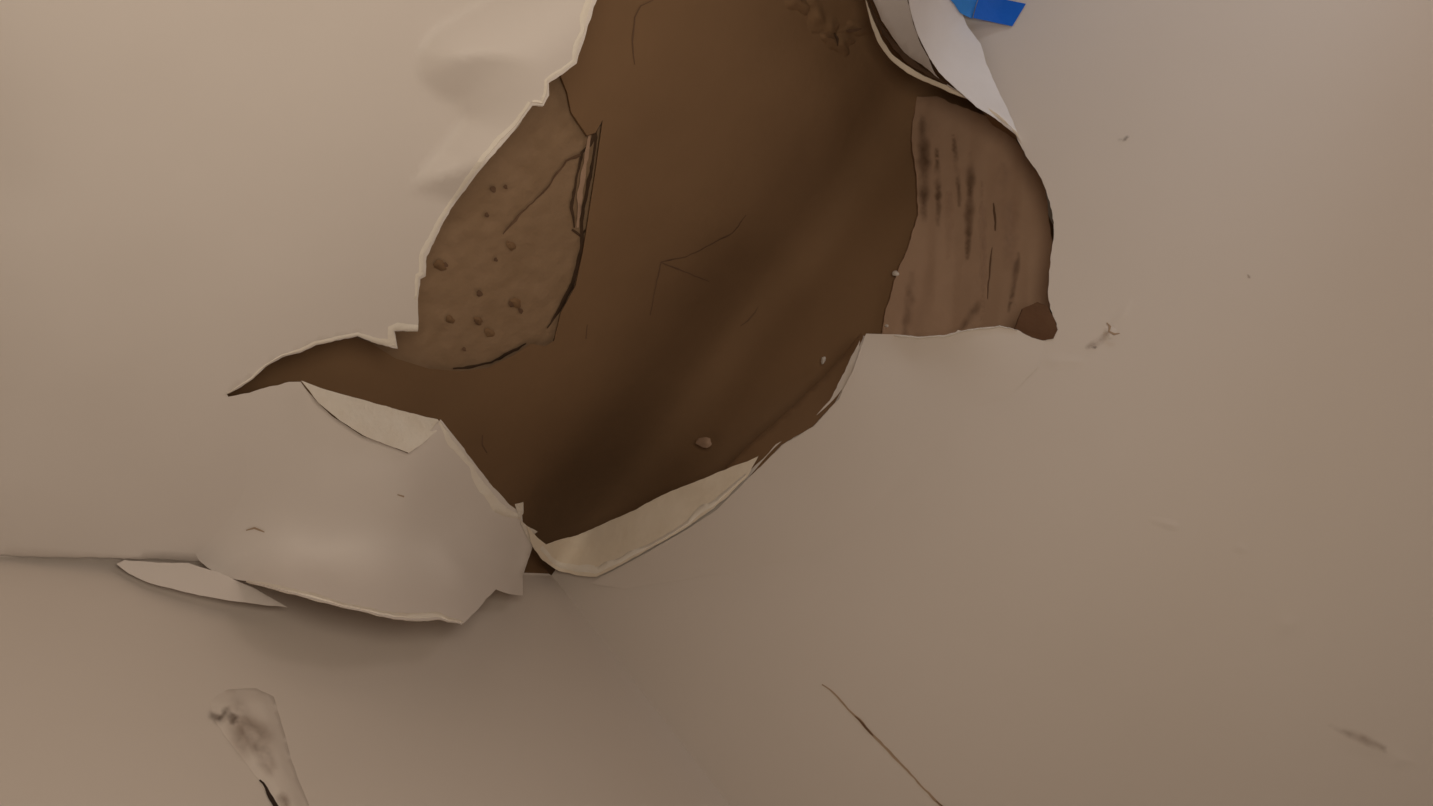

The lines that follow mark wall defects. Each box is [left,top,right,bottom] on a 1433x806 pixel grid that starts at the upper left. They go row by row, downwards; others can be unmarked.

peeling [0,0,1058,625]
crack [210,688,309,806]
crack [822,684,943,806]